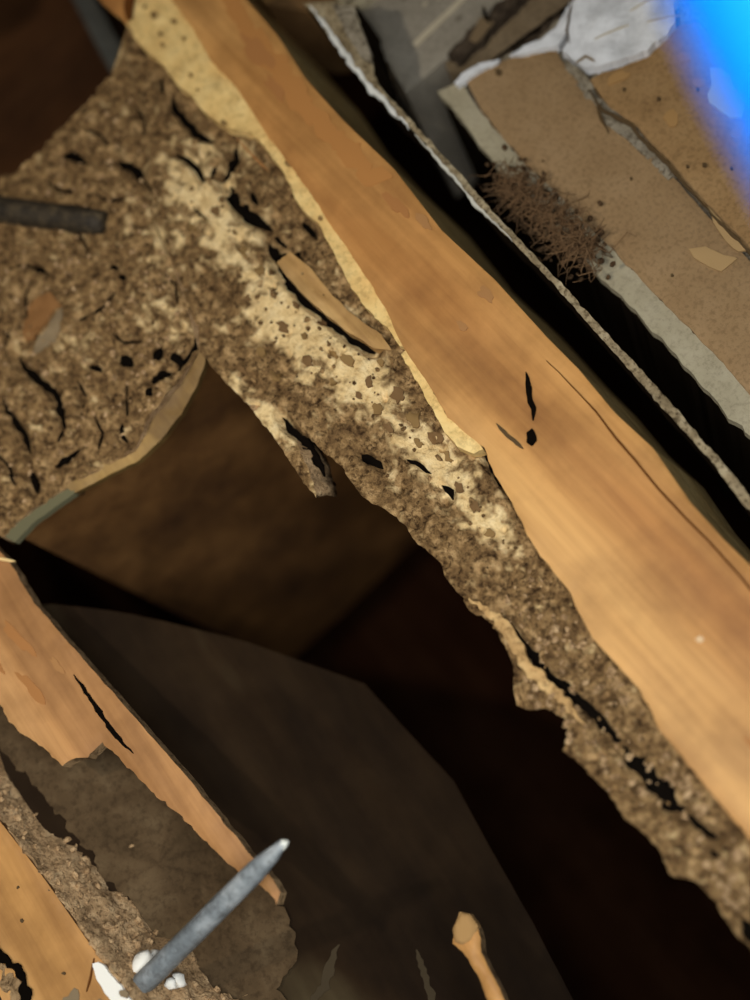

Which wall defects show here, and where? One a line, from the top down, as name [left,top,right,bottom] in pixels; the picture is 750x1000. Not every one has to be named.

crack [565,1,595,64]
crack [117,162,145,180]
crack [588,89,750,256]
spalling [689,207,746,272]
crack [484,360,750,590]
crack [73,675,134,754]
crack [0,949,32,1000]
crack [86,958,95,992]